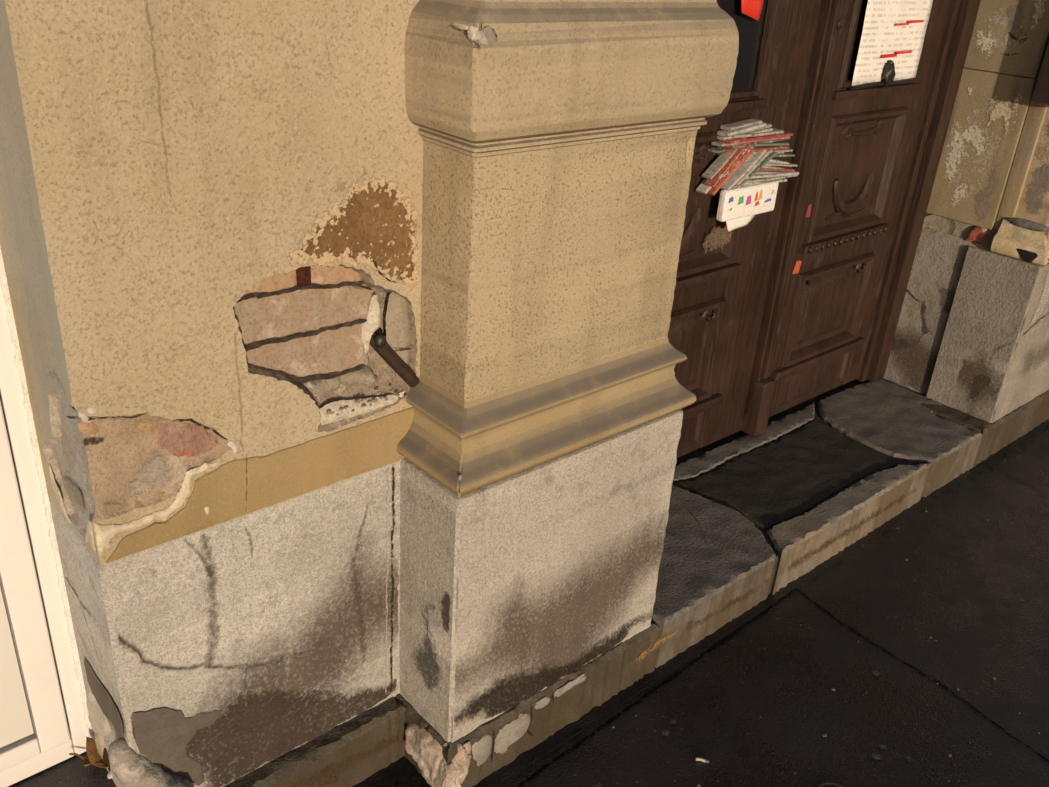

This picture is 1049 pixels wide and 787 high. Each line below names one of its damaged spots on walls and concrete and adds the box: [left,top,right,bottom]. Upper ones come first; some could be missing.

flaking render [233,174,421,432]
flaking render [43,390,237,555]
crack [118,636,229,670]
water stain [186,505,399,787]
crack [385,467,395,692]
water stain [414,604,439,690]
spalling [405,674,586,787]
water stain [454,533,664,723]